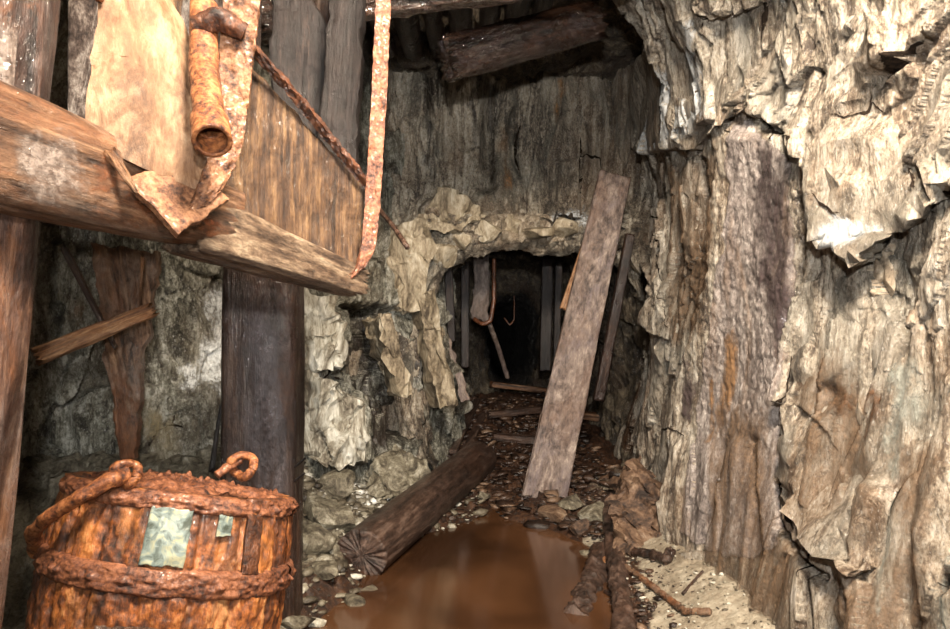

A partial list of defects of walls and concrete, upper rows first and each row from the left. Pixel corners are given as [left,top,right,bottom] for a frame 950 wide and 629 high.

crack [812,193,839,219]
crack [907,168,915,187]
water stain [756,147,789,354]
crack [775,356,792,422]
crack [776,467,794,530]